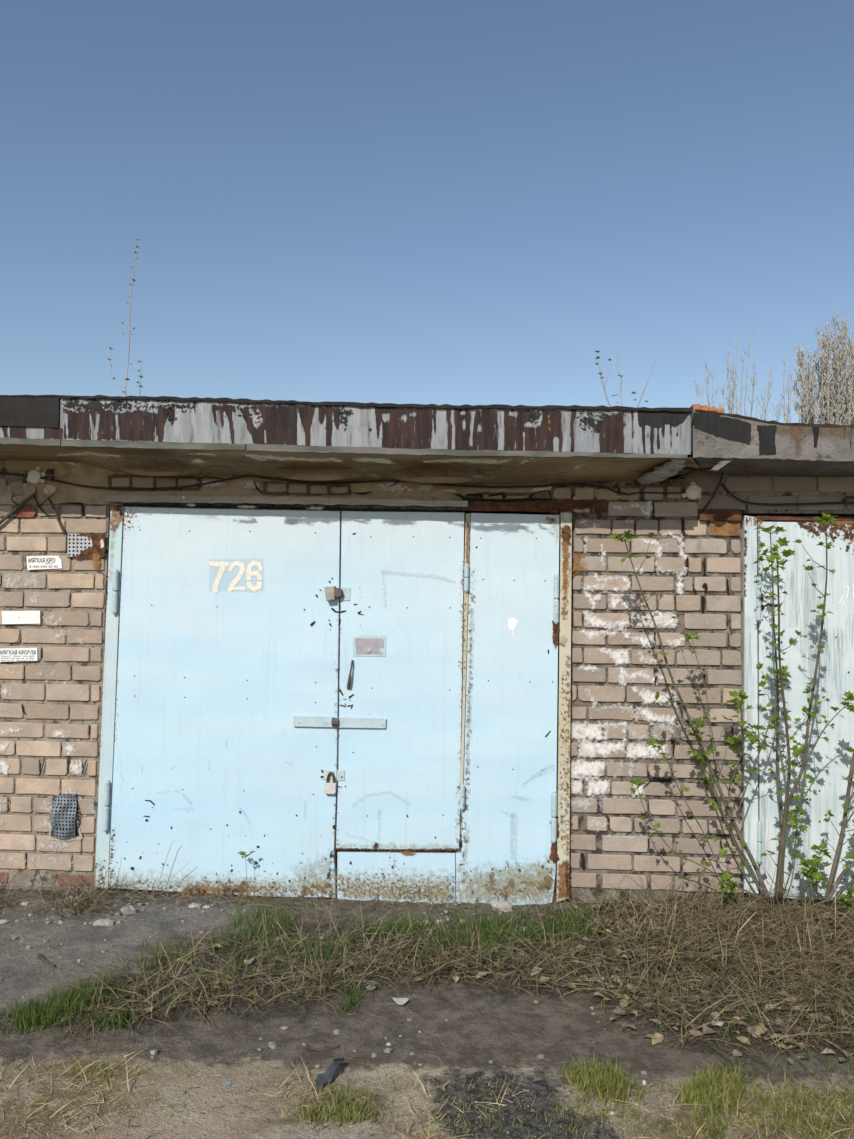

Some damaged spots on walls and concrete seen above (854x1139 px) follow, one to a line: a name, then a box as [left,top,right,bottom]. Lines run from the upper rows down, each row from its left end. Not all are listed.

corrosion [1,426,27,439]
corrosion [43,407,175,442]
corrosion [212,404,341,446]
leakage [612,495,652,515]
corrosion [796,515,854,554]
leakage [570,533,687,809]
corrosion [92,501,600,904]